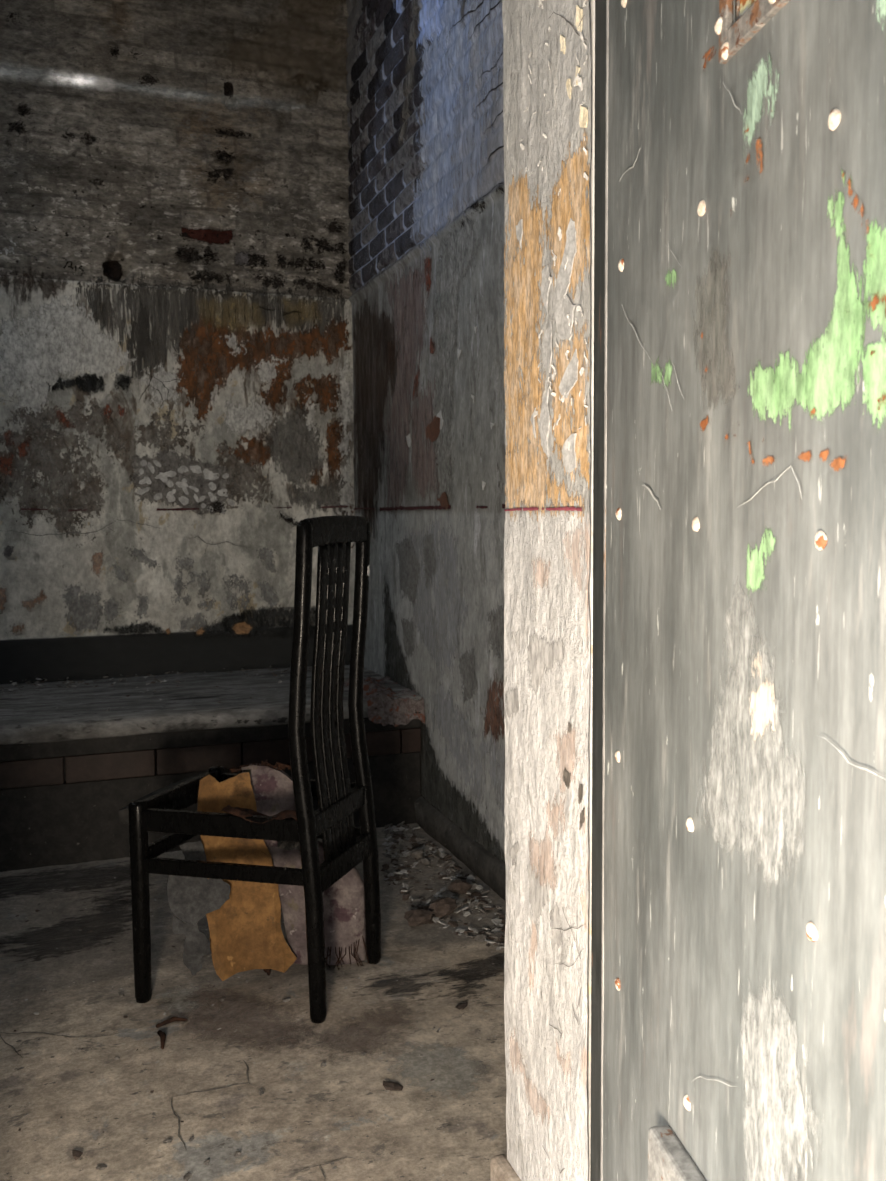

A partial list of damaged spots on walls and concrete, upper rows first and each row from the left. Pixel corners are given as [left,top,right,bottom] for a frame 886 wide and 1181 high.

crack [443,0,501,40]
flaking render [174,0,435,295]
water stain [353,0,504,291]
crack [455,52,504,218]
water stain [0,267,347,380]
rust [412,257,433,298]
peeling [458,0,590,526]
peeling [0,291,298,583]
rust [173,299,420,538]
peeling [302,349,356,516]
peeling [62,584,122,631]
peeling [172,547,280,634]